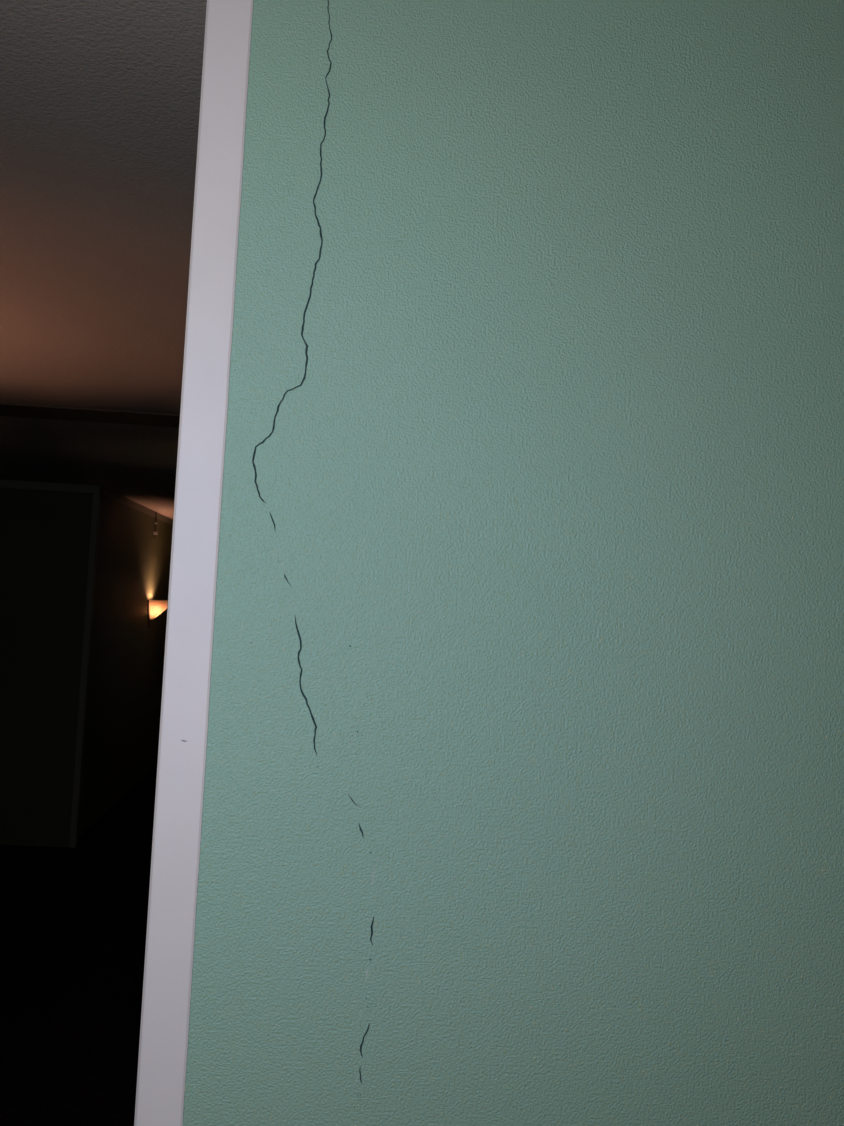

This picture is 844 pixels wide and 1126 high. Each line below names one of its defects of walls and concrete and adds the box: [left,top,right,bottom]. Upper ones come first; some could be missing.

crack [252,0,332,529]
crack [295,618,317,755]
crack [359,998,369,1094]